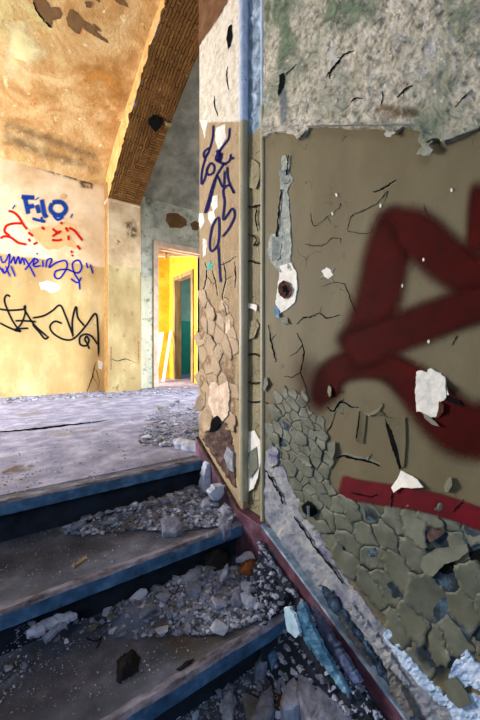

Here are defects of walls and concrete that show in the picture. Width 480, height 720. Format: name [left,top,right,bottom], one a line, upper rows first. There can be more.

flaking render [33,0,108,43]
crack [326,50,354,79]
peeling [261,0,480,156]
crack [380,85,412,107]
flaking render [166,195,218,230]
crack [306,180,396,246]
crack [248,282,360,433]
crack [0,420,106,432]
peeling [194,289,239,488]
peeling [415,368,463,427]
crack [336,453,380,467]
peeling [248,377,480,720]